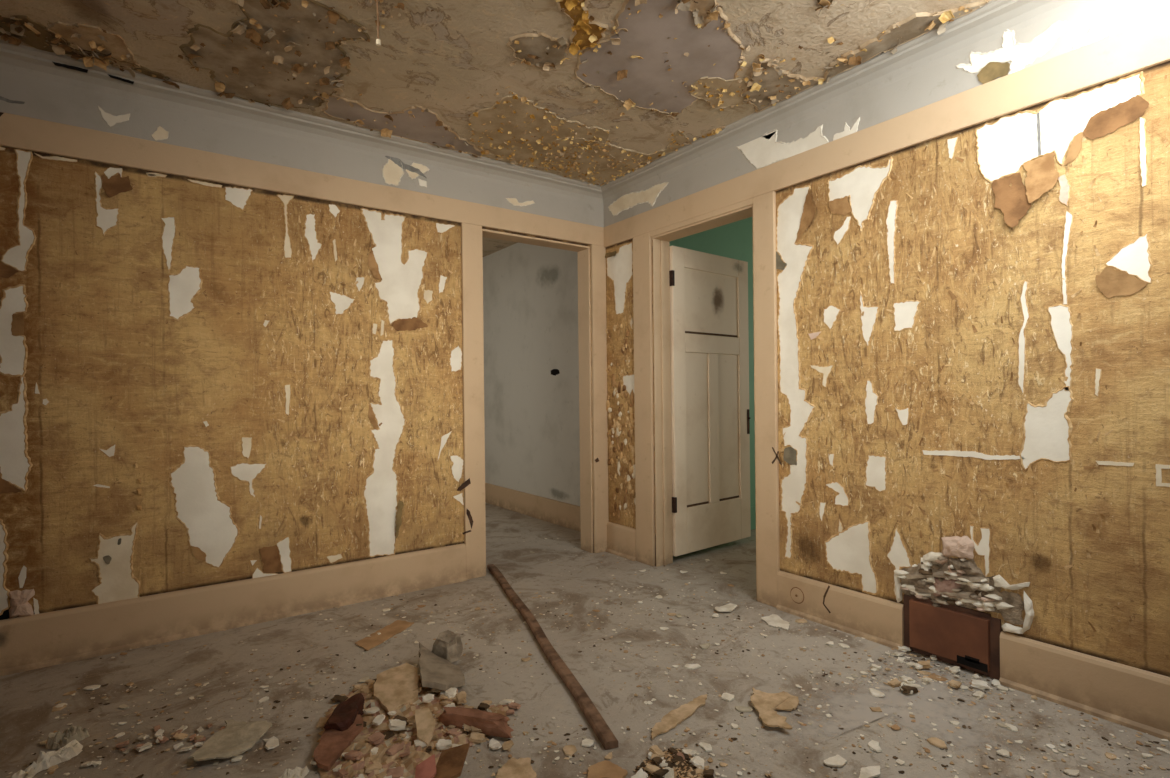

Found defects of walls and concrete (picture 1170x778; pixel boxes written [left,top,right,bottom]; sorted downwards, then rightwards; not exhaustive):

peeling [0,149,36,494]
peeling [160,217,203,321]
peeling [361,208,428,557]
peeling [178,0,989,187]
peeling [771,185,879,595]
peeling [827,156,893,245]
peeling [885,200,898,284]
peeling [1017,211,1074,471]
peeling [974,71,1149,227]
peeling [1095,233,1153,298]
peeling [168,445,240,568]
spalling [887,525,1034,634]